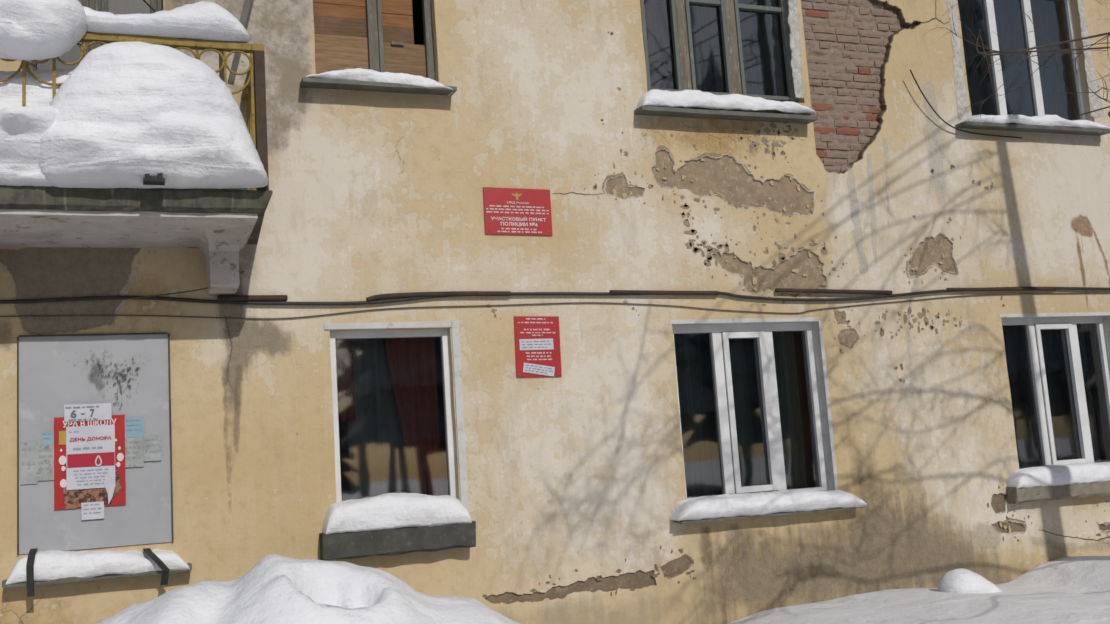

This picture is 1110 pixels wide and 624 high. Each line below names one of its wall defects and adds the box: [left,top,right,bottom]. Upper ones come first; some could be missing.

flaking render [801,0,921,174]
flaking render [593,121,962,356]
damp [220,284,287,404]
flaking render [482,545,696,604]
damp [710,469,1002,612]
flaking render [987,484,1032,542]
flaking render [1085,501,1110,545]